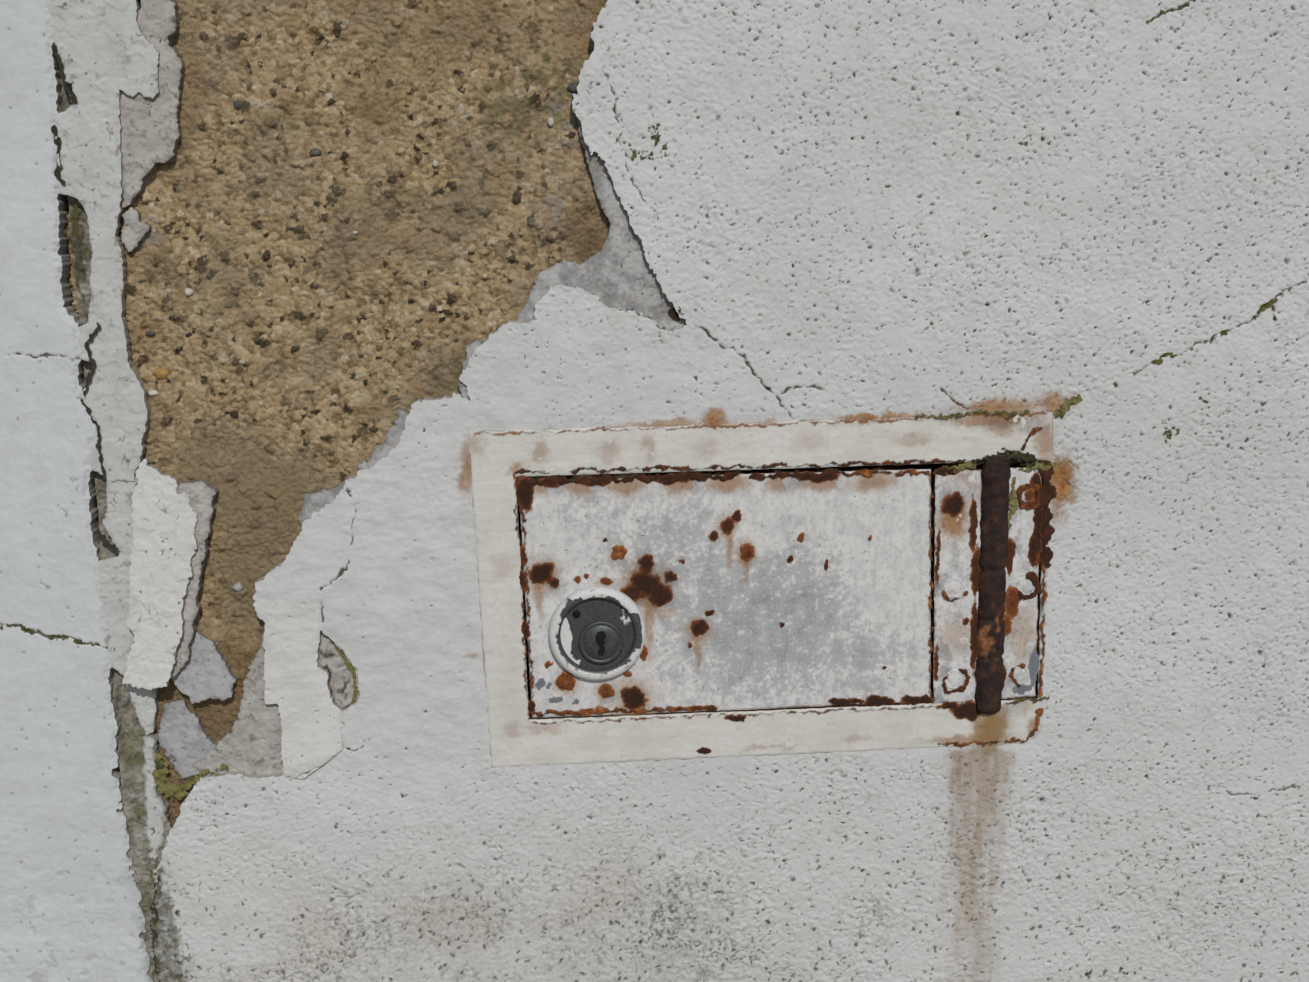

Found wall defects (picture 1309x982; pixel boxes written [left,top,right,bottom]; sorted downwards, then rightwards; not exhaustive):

flaking render [66,212,79,312]
flaking render [118,0,686,828]
rust [643,418,686,426]
rust [704,409,724,424]
crack [624,308,821,417]
rust [972,399,1028,414]
crack [1114,274,1309,386]
crack [0,0,187,982]
rust [1050,460,1075,510]